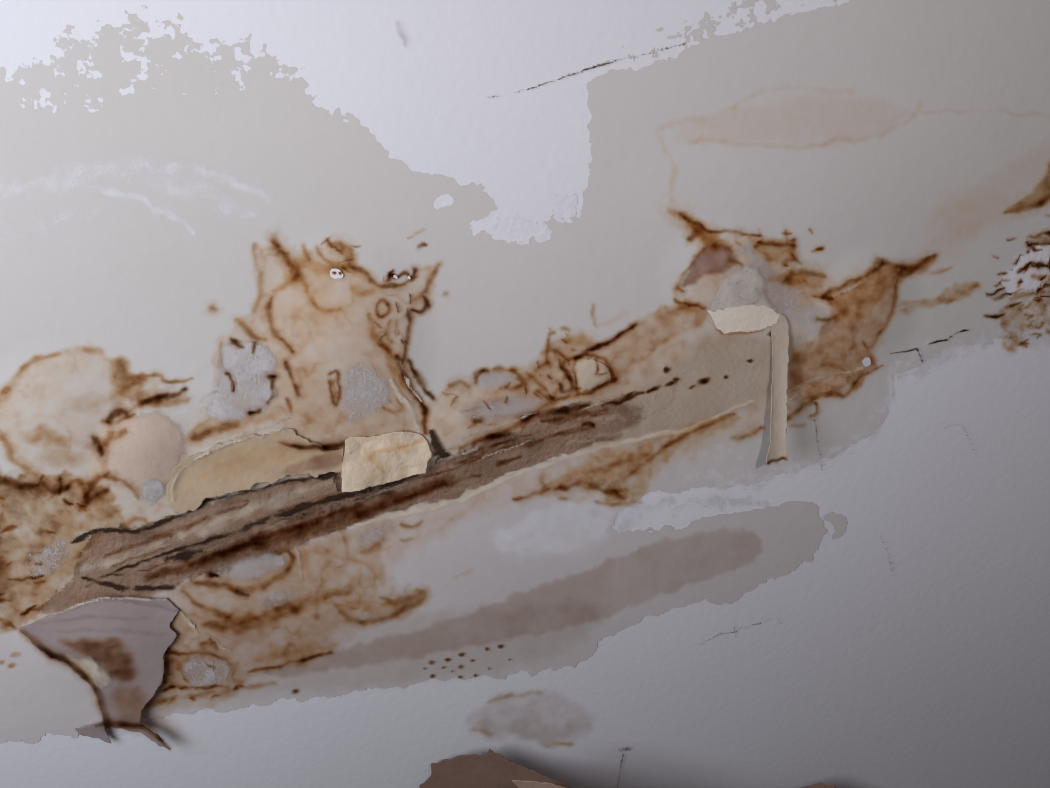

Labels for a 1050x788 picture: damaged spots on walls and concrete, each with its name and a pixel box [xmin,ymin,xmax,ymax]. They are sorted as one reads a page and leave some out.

crack [488,43,685,98]
leakage [328,266,434,434]
leakage [139,381,187,405]
leakage [192,333,298,447]
leakage [106,408,130,424]
leakage [283,442,344,452]
peeling [584,440,614,451]
peeling [632,422,661,439]
peeling [633,435,673,446]
leakage [0,477,108,508]
peeling [823,512,847,539]
peeling [18,596,179,750]